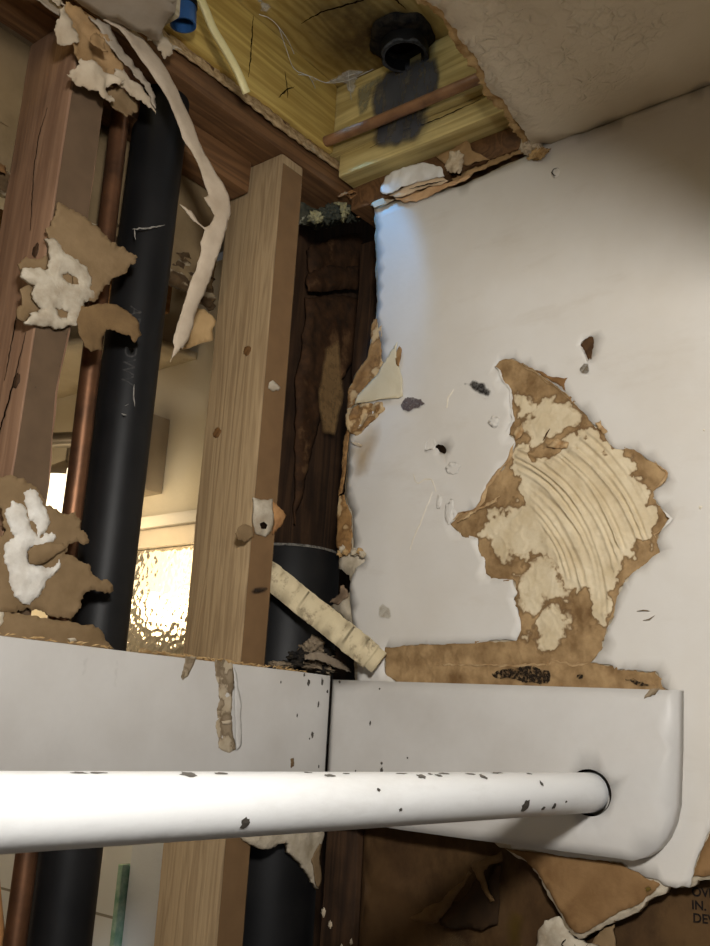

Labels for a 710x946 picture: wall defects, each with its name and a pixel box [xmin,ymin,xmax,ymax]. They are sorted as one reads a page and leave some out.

crack [301,0,364,24]
leakage [358,59,438,145]
peeling [336,319,403,559]
peeling [385,359,673,699]
peeling [215,659,242,753]
peeling [504,848,660,934]
peeling [693,834,710,877]